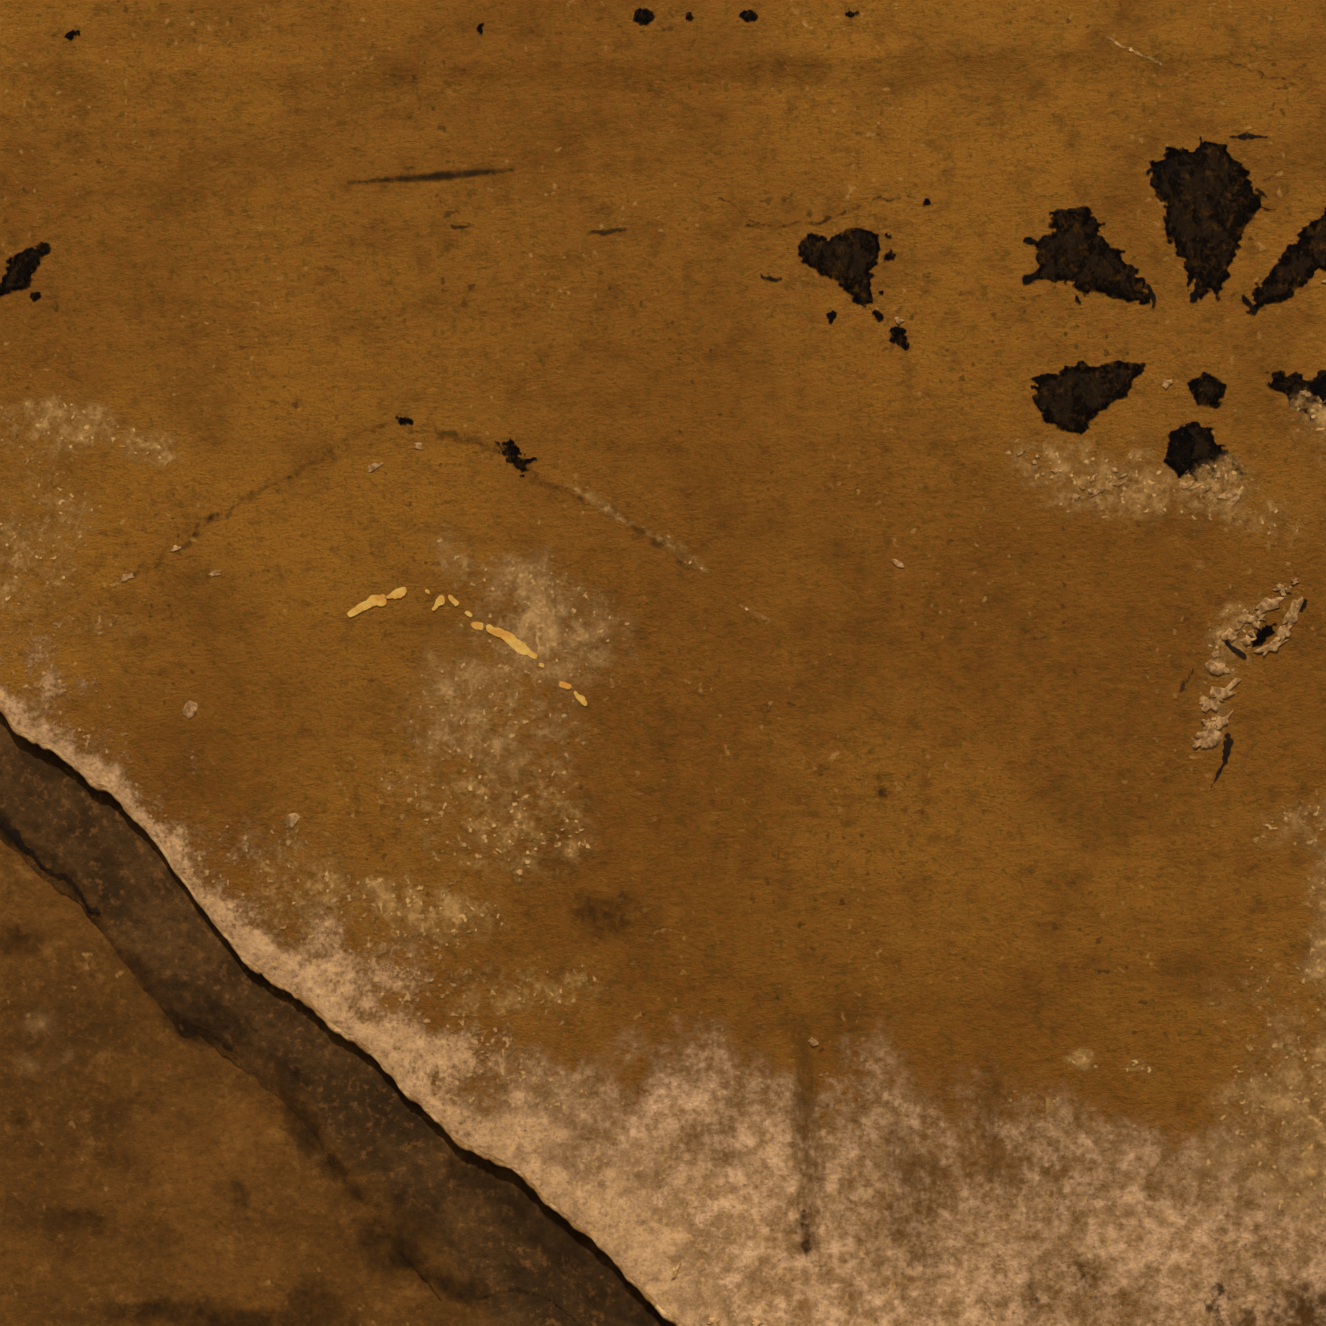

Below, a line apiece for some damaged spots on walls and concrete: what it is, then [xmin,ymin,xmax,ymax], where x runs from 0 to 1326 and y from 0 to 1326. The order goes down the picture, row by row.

peeling [798,227,909,350]
peeling [1296,390,1326,432]
peeling [1017,437,1141,512]
spalling [182,700,198,719]
peeling [559,681,587,706]
spalling [1180,578,1307,787]
crack [0,821,100,913]
efflorescence [260,860,503,946]
spalling [0,706,686,1326]
leakage [462,802,1326,1326]